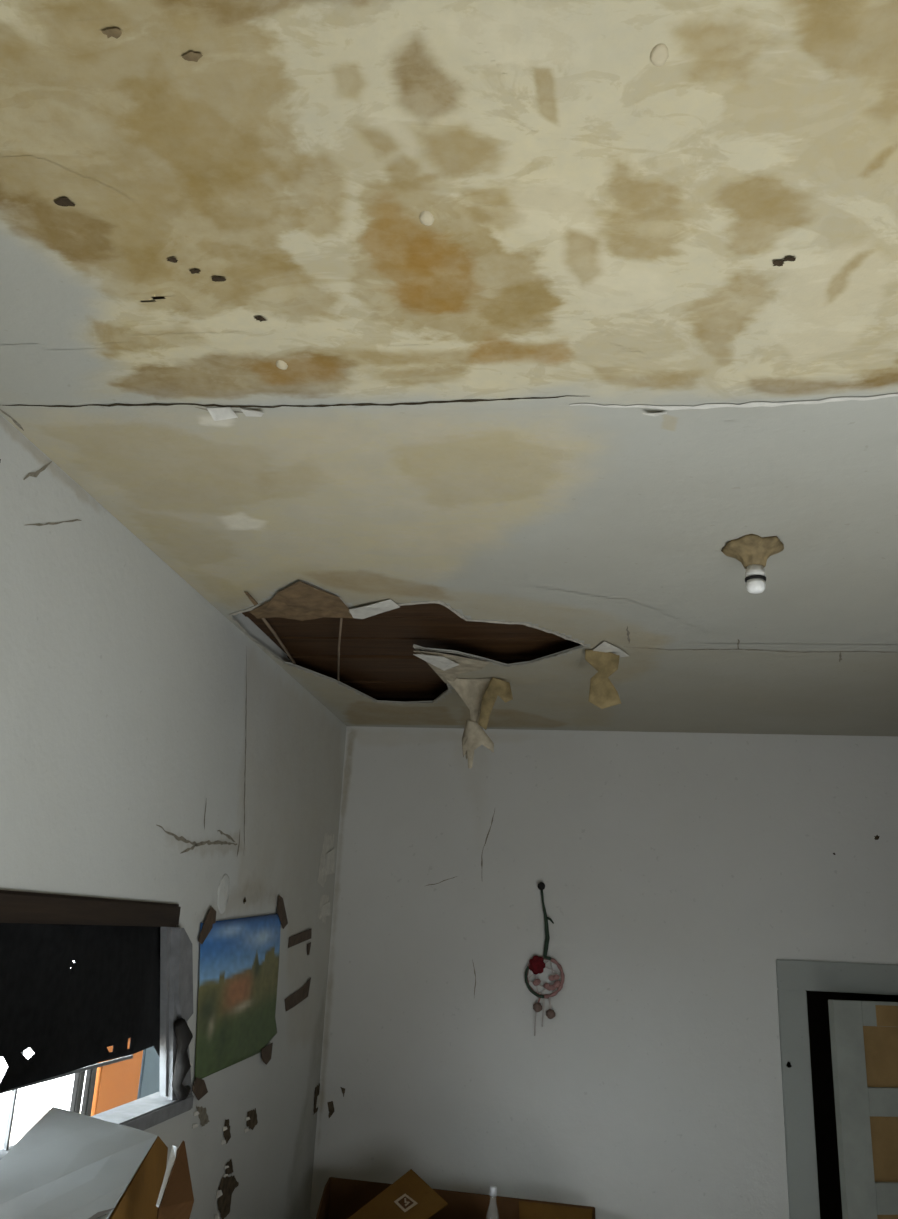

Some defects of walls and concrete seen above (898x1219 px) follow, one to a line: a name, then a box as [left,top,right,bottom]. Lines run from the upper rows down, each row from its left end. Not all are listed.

leakage [0,0,898,587]
crack [0,394,898,431]
flaking render [349,599,400,619]
flaking render [413,654,459,671]
flaking render [593,641,629,657]
crack [157,650,247,856]
peeling [221,1108,258,1145]
peeling [214,1159,239,1219]